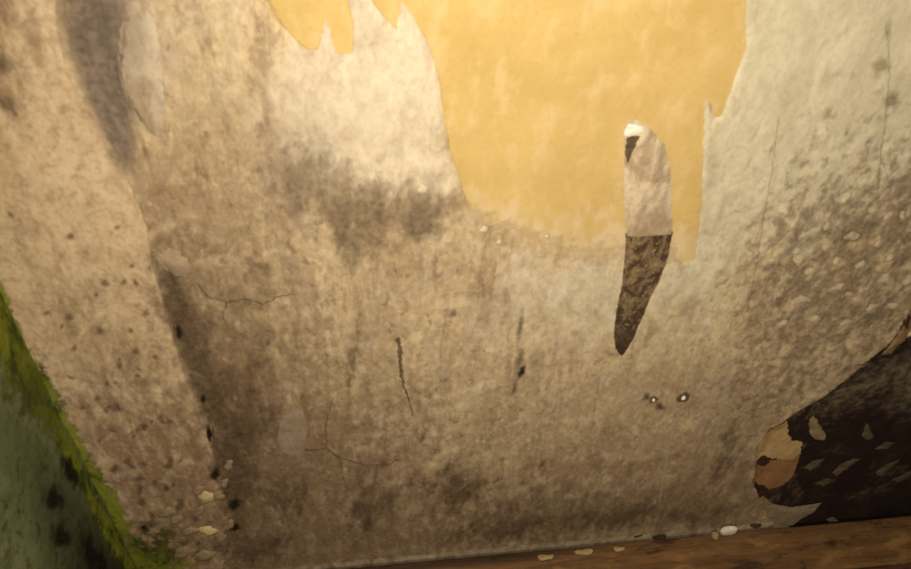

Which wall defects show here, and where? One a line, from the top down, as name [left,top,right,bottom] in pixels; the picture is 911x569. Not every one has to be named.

mould [61,457,78,485]
peeling [0,0,234,569]
leakage [286,168,442,238]
crack [396,337,413,416]
peeling [269,0,746,355]
peeling [752,309,911,527]